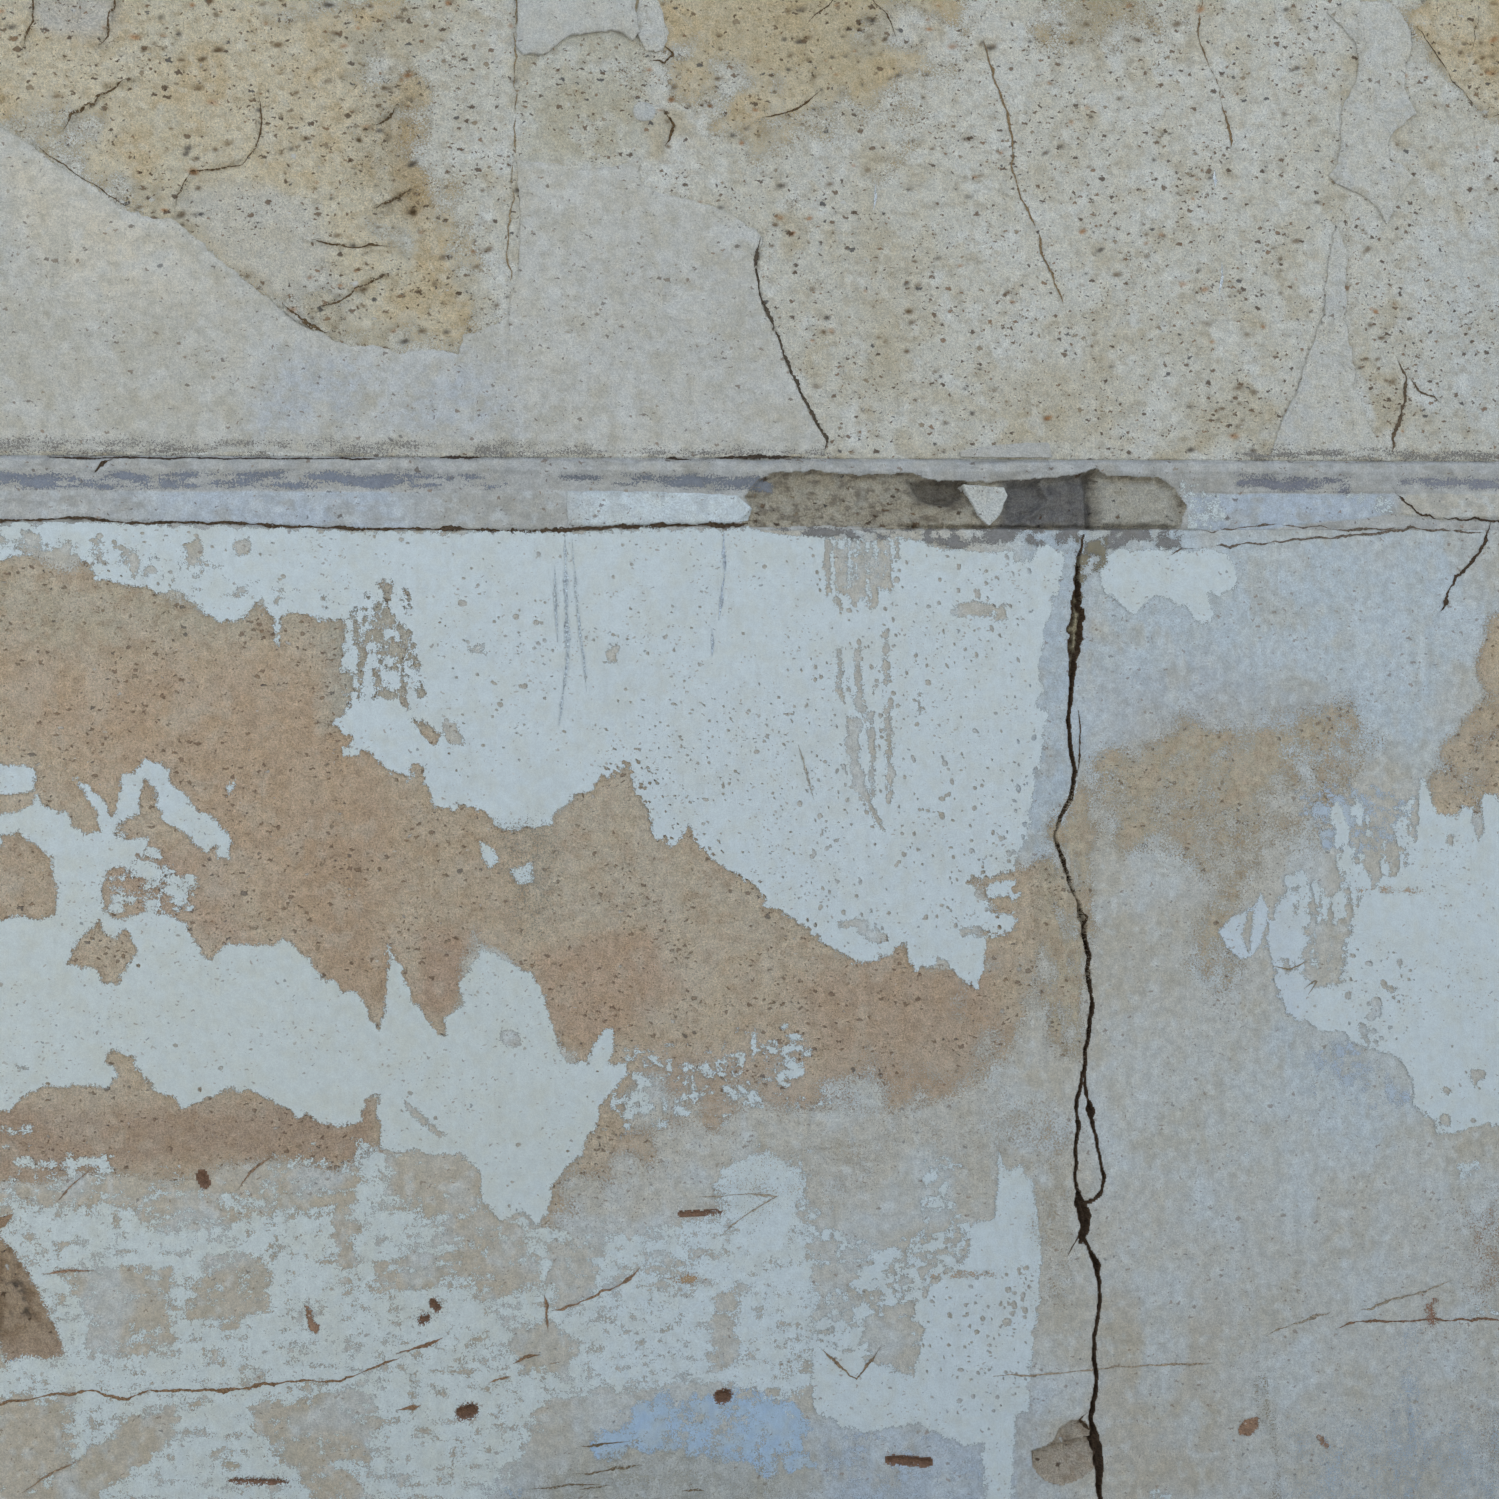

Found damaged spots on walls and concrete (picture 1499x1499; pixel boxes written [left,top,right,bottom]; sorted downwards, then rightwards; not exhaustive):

spalling [516,0,979,190]
spalling [1023,0,1194,63]
spalling [0,0,826,459]
crack [666,235,829,460]
crack [54,456,374,472]
crack [439,453,480,461]
crack [1169,495,1499,611]
peeling [0,468,1499,1499]
crack [1053,534,1106,1499]